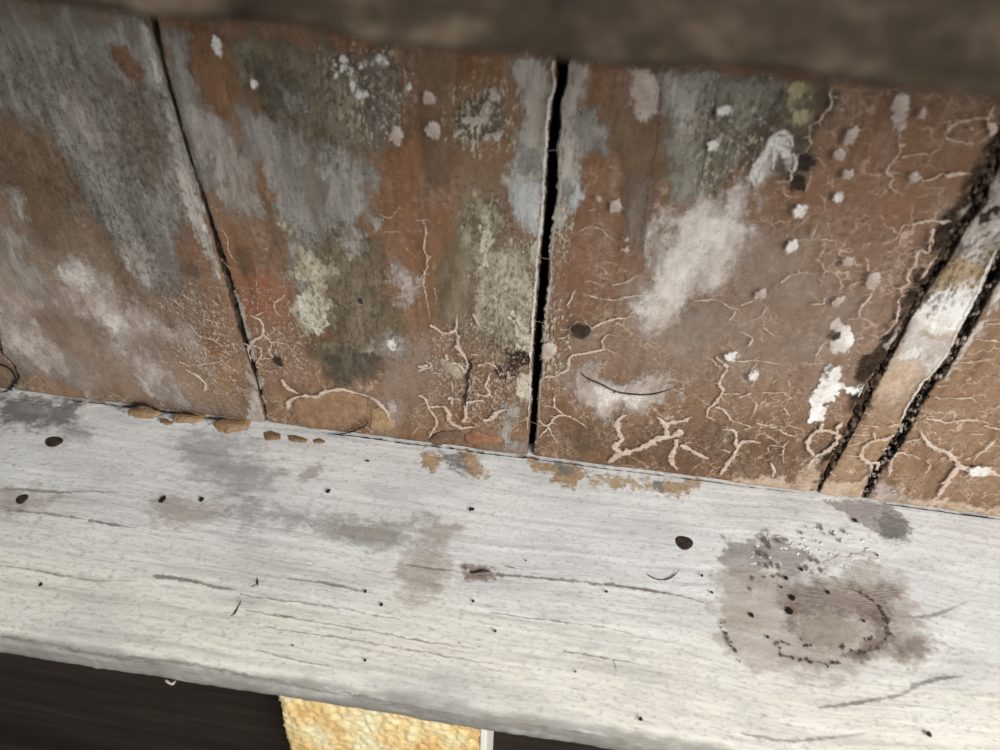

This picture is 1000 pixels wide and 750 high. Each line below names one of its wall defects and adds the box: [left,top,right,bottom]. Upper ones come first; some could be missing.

damp [0,0,406,436]
damp [415,49,504,187]
damp [436,54,557,402]
damp [557,61,840,254]
crack [781,105,997,340]
crack [72,207,1000,520]
damp [710,559,929,685]